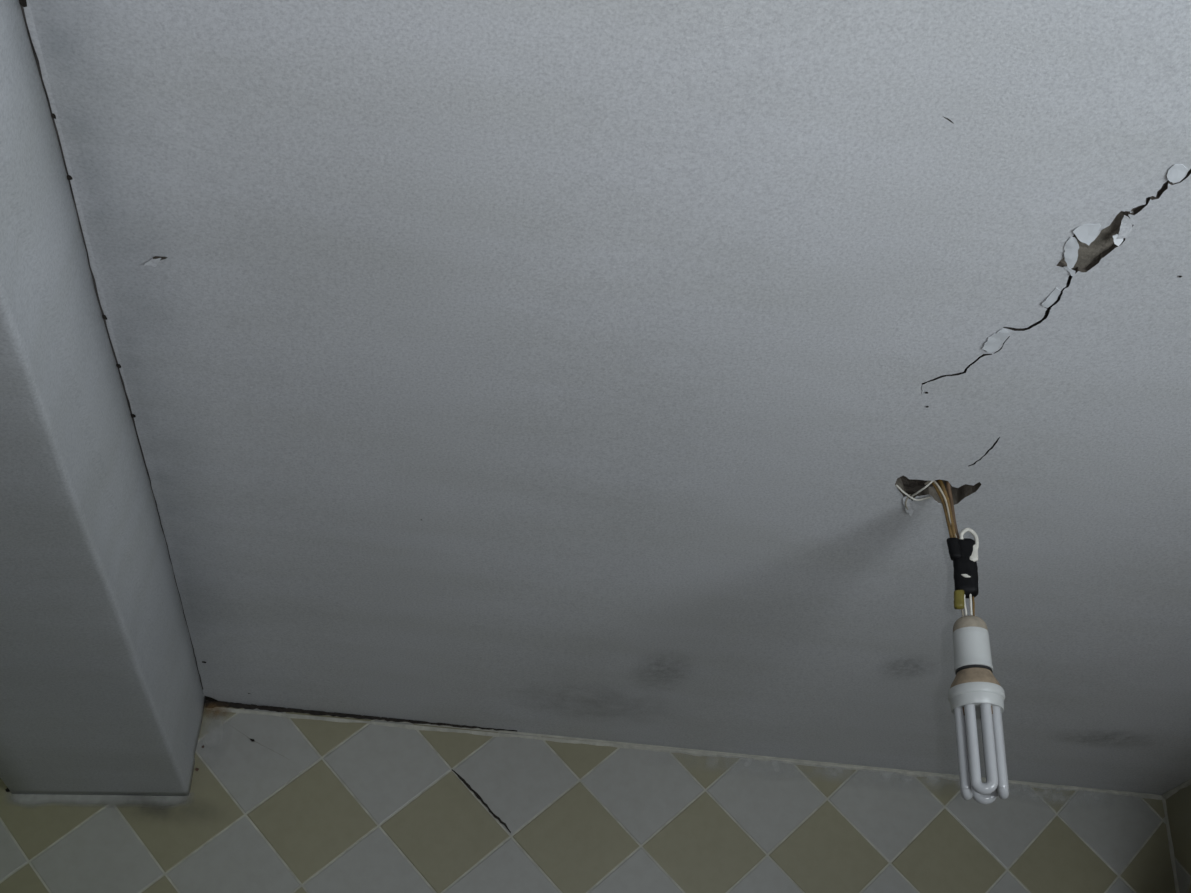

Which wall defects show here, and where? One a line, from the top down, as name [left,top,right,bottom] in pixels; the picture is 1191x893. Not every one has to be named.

crack [1128,164,1191,215]
spalling [1056,211,1133,276]
crack [921,274,1073,408]
crack [969,437,1000,466]
crack [452,769,511,833]